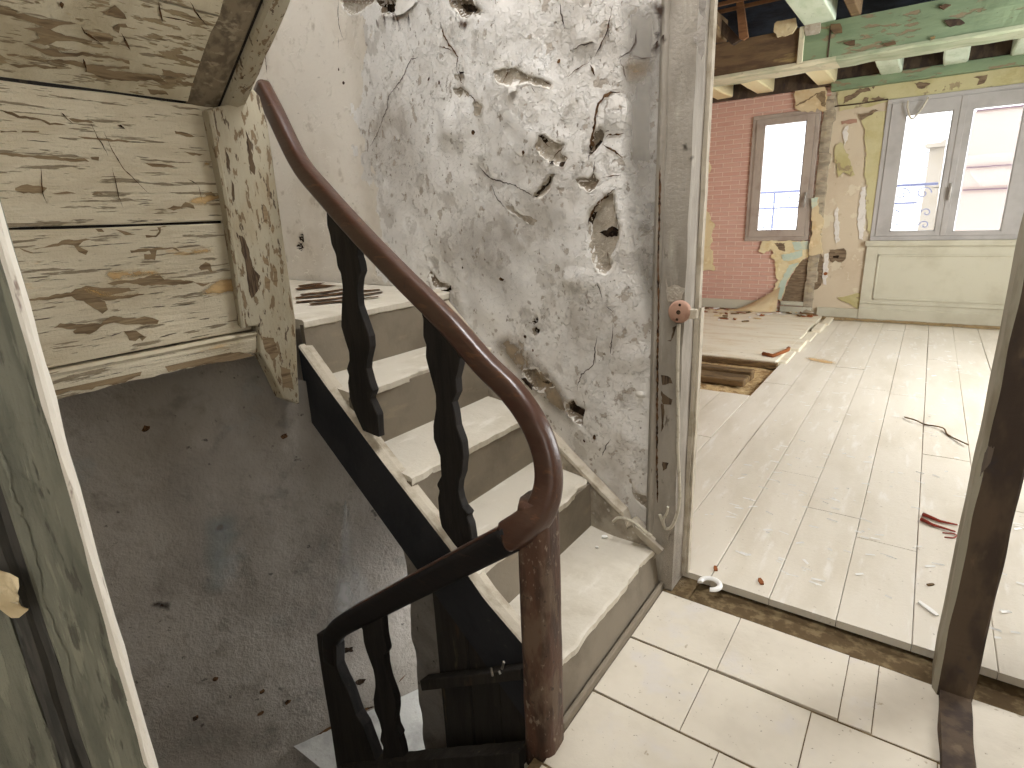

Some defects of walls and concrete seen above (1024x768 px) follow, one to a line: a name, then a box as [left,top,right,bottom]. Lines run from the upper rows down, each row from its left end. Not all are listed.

flaking render [449,0,481,20]
peeling [0,5,201,95]
flaking render [493,65,554,93]
crack [569,6,651,169]
crack [479,165,531,206]
flaking render [522,133,569,199]
flaking render [575,125,623,277]
peeling [20,226,179,260]
peeling [29,262,213,341]
flaking render [728,240,847,312]
peeling [165,337,294,390]
flaking render [565,399,587,427]